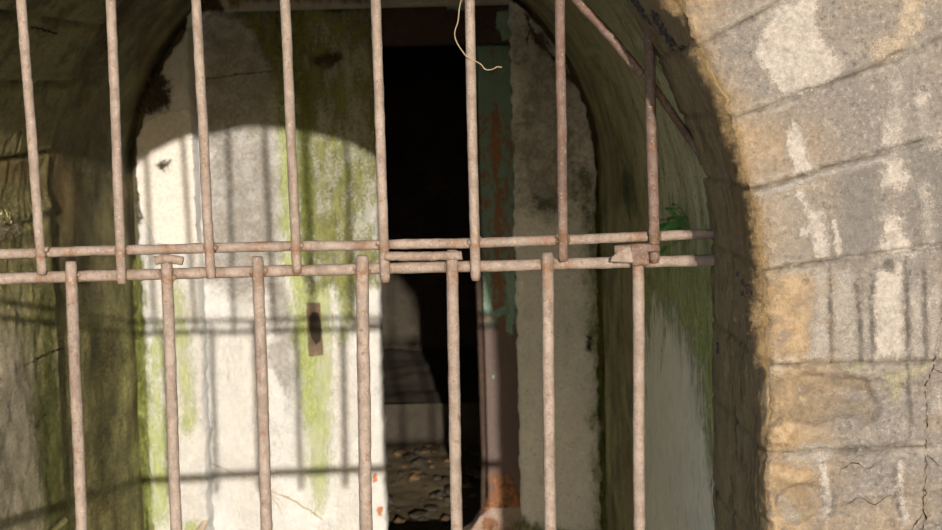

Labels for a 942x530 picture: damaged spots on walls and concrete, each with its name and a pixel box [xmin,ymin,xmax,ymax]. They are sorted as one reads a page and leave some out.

leakage [753,0,942,258]
leakage [0,306,43,530]
leakage [205,12,359,530]
rust [482,472,520,530]
leakage [810,210,942,414]
leakage [892,460,909,525]
crack [912,299,942,530]